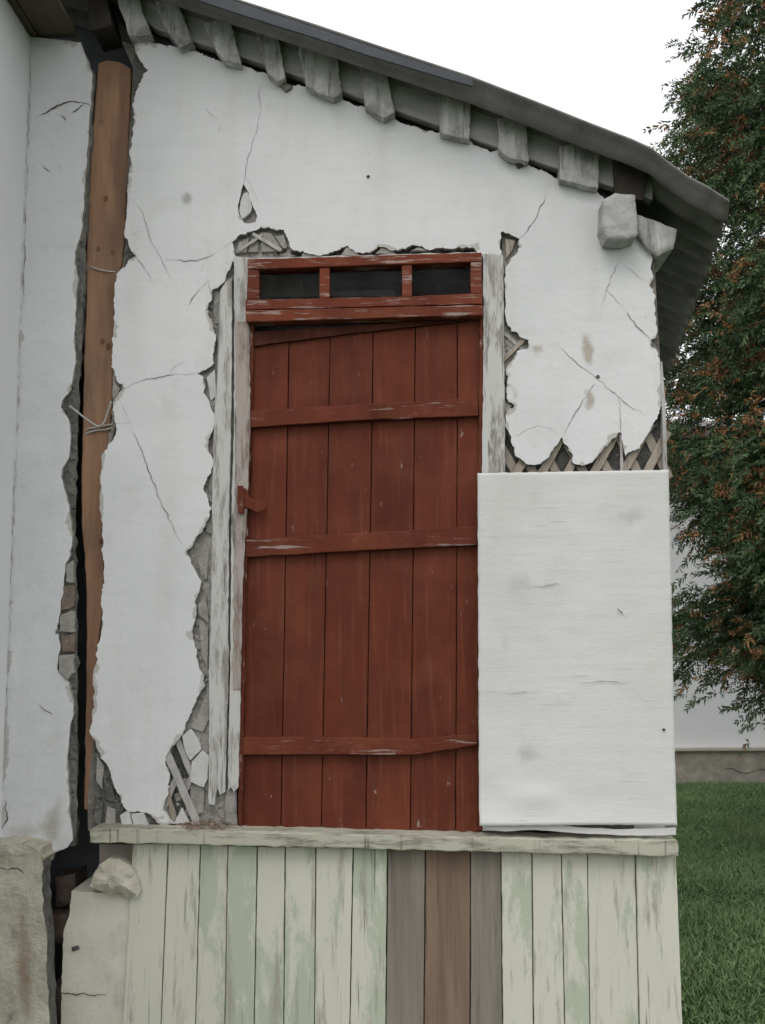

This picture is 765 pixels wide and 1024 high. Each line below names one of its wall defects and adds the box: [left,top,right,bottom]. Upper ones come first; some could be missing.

crack [130,199,214,306]
spalling [329,247,475,256]
crack [603,263,647,336]
crack [22,52,95,841]
spalling [107,369,123,449]
crack [116,361,194,538]
crack [525,346,642,431]
spalling [501,234,673,478]
spalling [164,470,230,826]